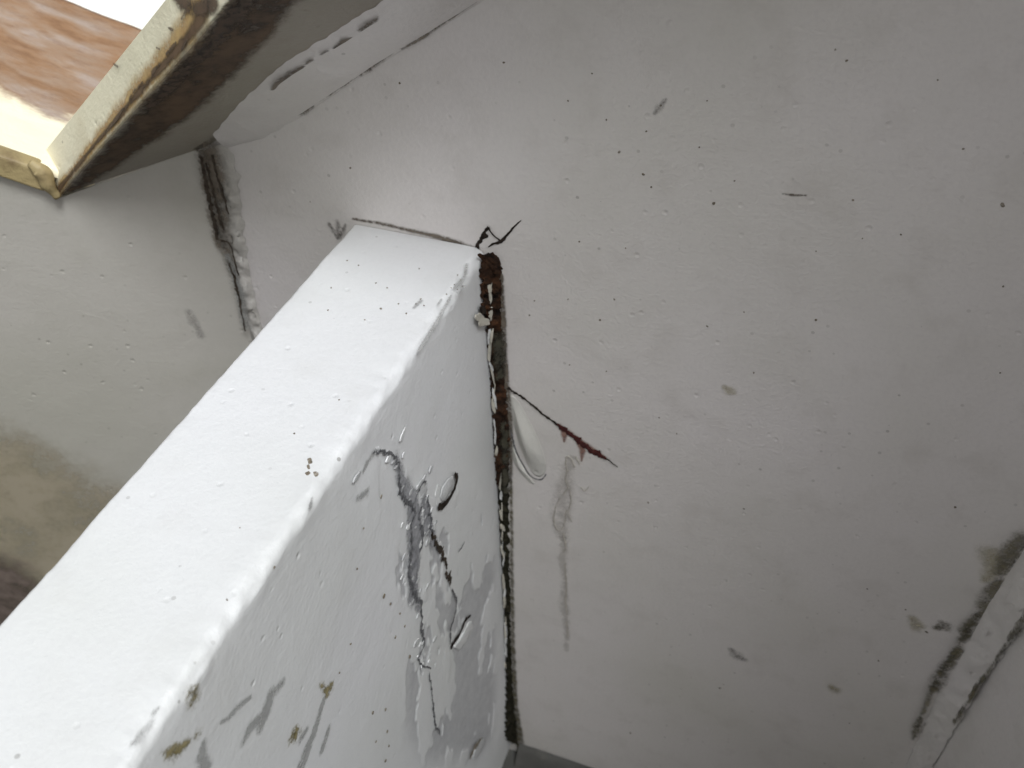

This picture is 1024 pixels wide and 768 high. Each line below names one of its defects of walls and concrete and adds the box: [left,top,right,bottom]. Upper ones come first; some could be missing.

rust [56,0,295,193]
crack [199,155,246,332]
crack [352,218,522,249]
rust [477,252,510,487]
crack [507,387,617,467]
peeling [352,425,502,768]
water stain [912,535,1024,740]